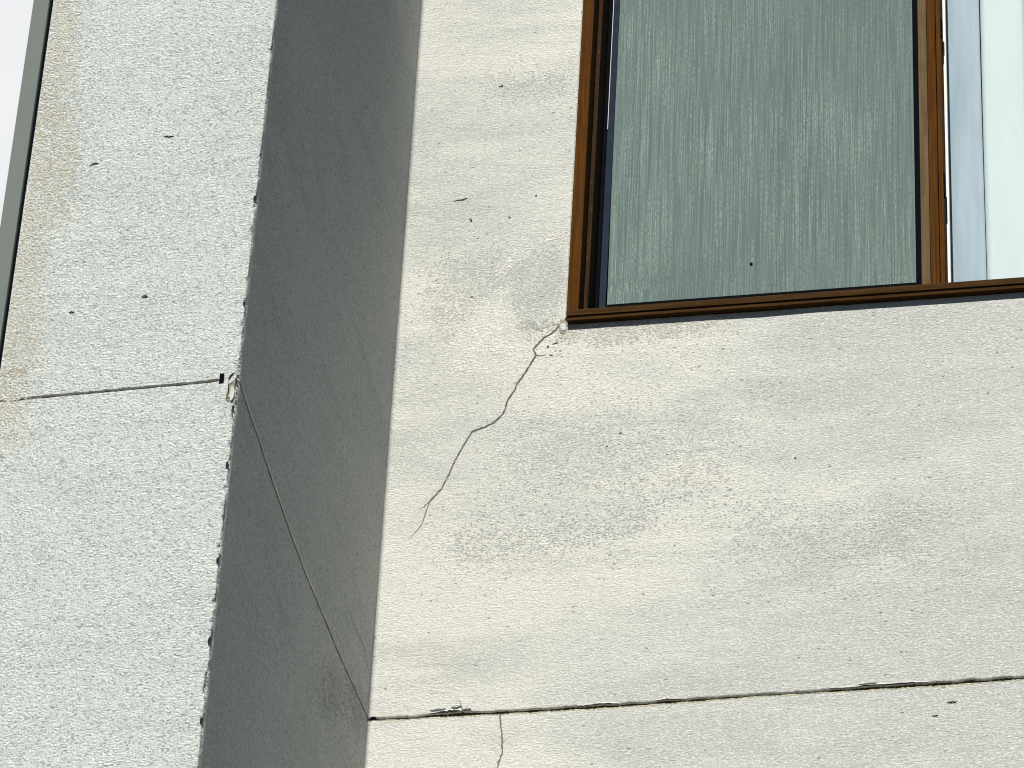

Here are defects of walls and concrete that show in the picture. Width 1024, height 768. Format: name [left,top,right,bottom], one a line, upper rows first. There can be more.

spalling [226,372,237,409]
crack [409,319,565,538]
crack [496,713,504,768]